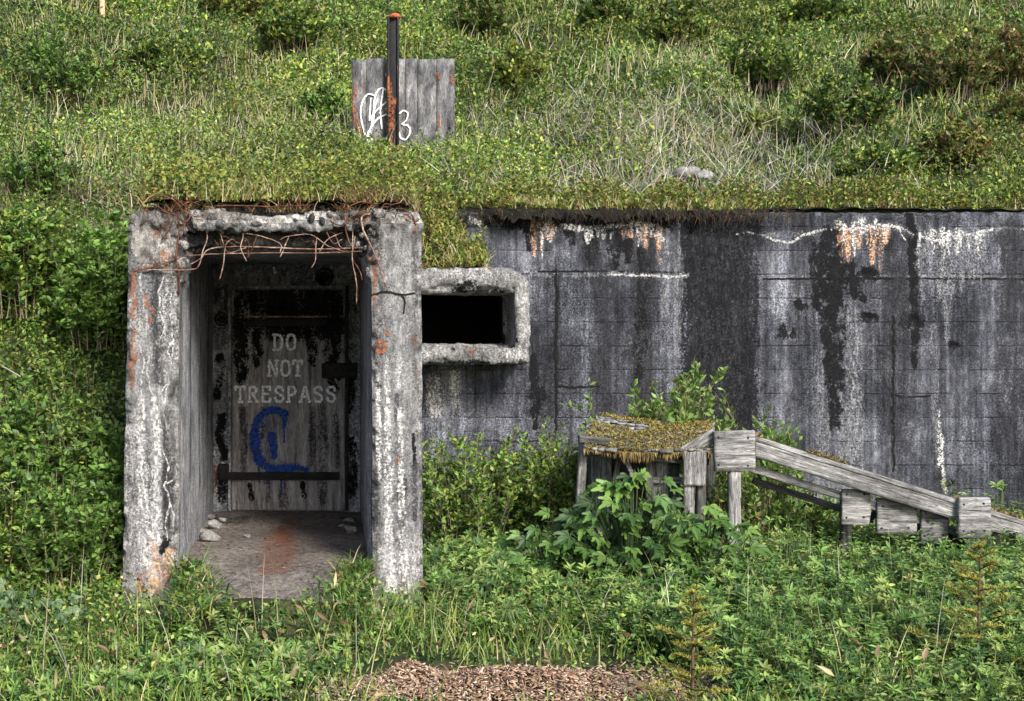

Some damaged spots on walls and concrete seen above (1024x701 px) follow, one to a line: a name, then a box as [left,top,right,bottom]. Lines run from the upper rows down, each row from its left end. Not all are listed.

corrosion [530,220,557,256]
corrosion [621,219,665,249]
corrosion [836,218,890,264]
corrosion [128,250,170,388]
corrosion [374,330,390,354]
water stain [793,224,868,431]
water stain [890,213,984,459]
water stain [995,218,1024,464]
corrosion [137,538,173,596]